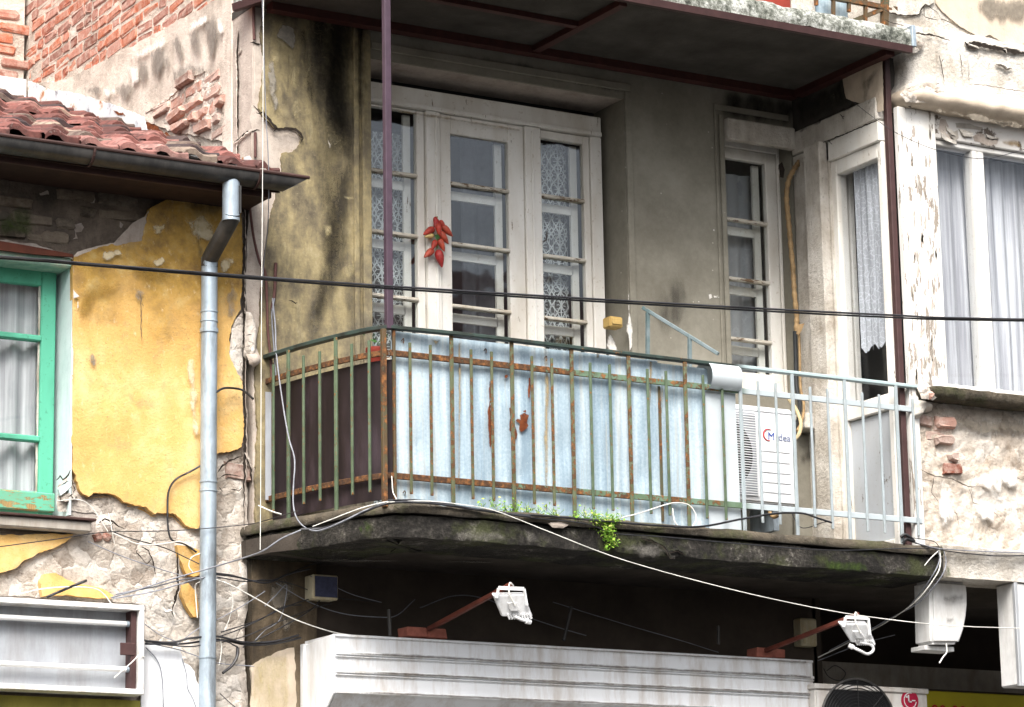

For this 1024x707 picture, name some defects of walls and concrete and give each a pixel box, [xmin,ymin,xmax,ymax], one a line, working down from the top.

damp [89,16,224,98]
flaking render [145,68,226,140]
flaking render [250,105,301,172]
damp [301,21,364,151]
peeling [889,0,1024,44]
peeling [189,216,213,240]
flaking render [246,193,275,330]
damp [312,168,348,333]
flaking render [907,126,1024,551]
corrosion [509,378,531,439]
flaking render [0,475,200,684]